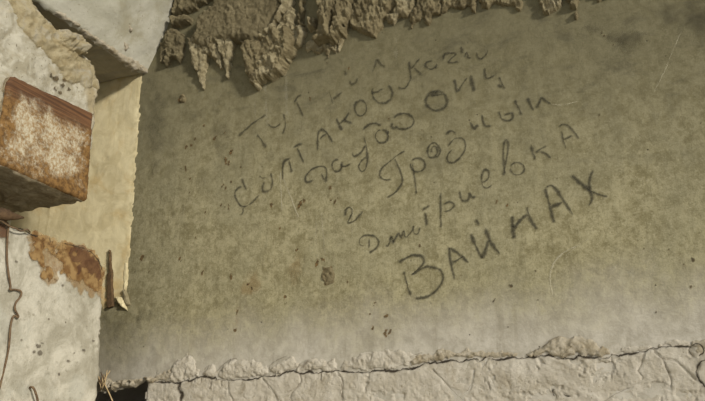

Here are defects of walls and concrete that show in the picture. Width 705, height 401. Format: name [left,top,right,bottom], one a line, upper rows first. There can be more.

spalling [160,0,523,91]
spalling [538,0,580,20]
rust [29,230,115,308]
crack [157,343,705,401]